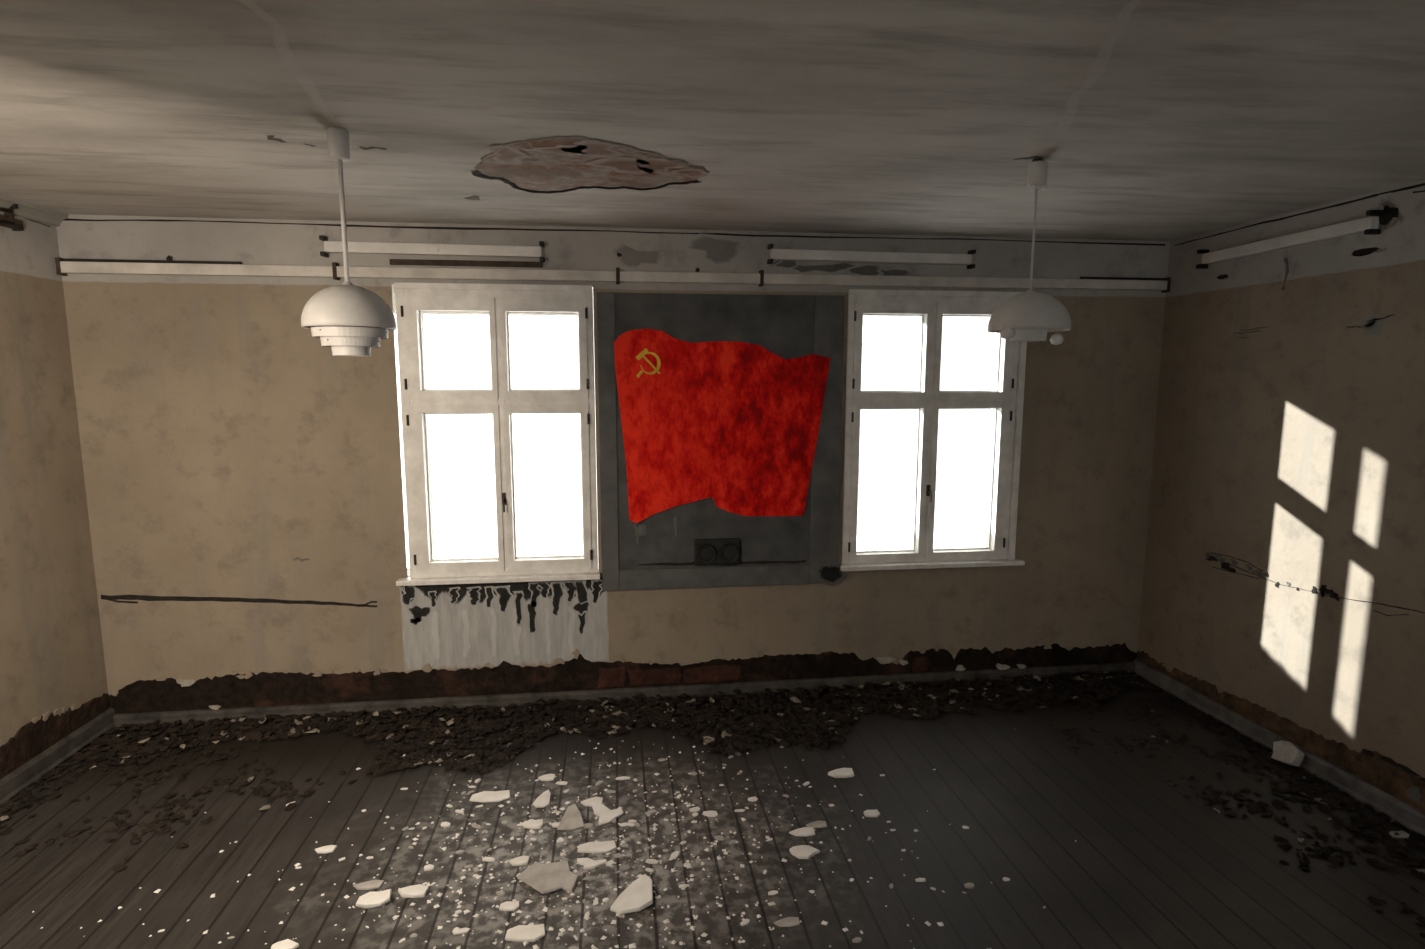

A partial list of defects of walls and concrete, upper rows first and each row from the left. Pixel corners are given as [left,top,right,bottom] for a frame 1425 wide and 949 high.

flaking render [472,136,710,194]
crack [101,595,378,607]
crack [1206,552,1425,616]
flaking render [0,642,1425,813]